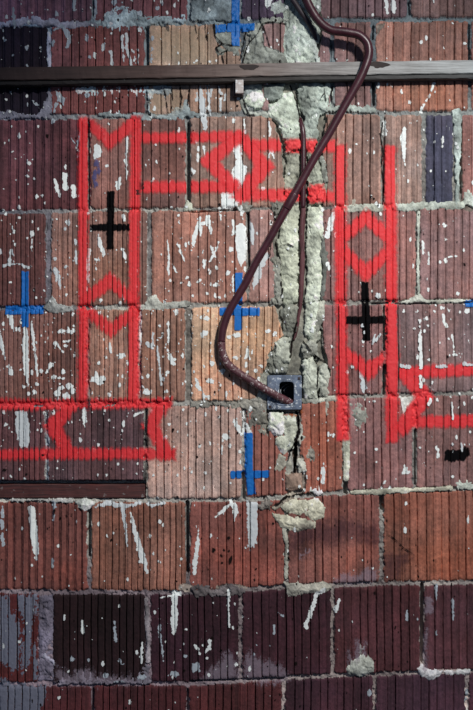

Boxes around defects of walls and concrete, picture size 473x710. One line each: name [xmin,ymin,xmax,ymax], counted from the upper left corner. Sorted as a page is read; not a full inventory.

crack [288,413,301,473]
crack [274,492,316,506]